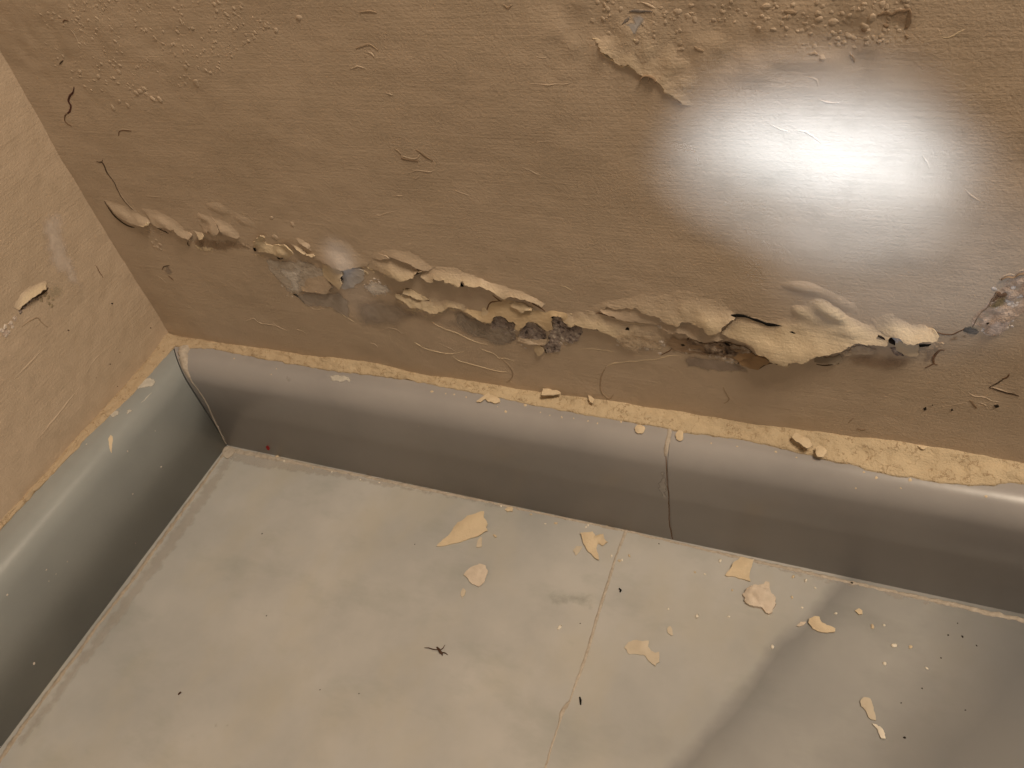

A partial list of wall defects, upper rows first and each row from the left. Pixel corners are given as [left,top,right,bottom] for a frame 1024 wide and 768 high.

peeling [592,0,705,107]
crack [64,87,74,126]
peeling [0,281,54,338]
peeling [103,199,1024,370]
crack [665,459,673,539]